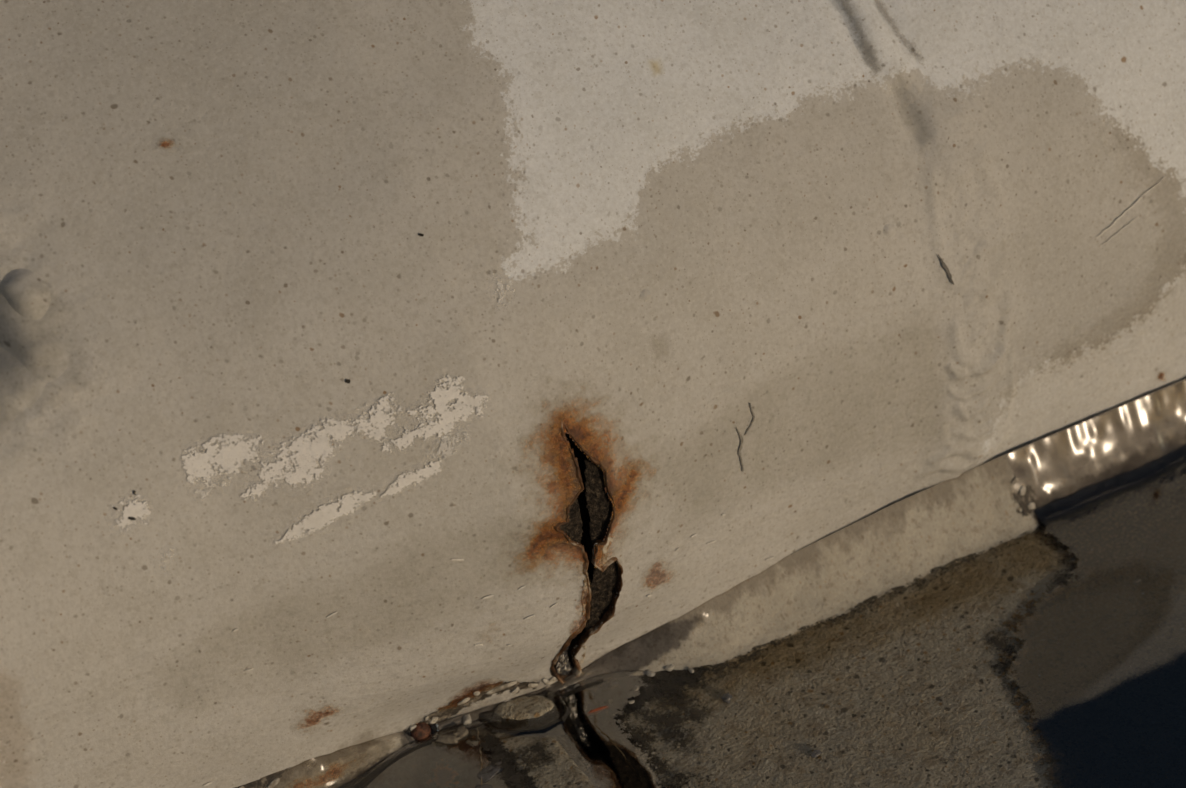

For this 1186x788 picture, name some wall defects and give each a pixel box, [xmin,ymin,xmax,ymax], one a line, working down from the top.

peeling [108,490,151,532]
peeling [181,375,488,544]
rust [524,407,647,568]
crack [550,420,623,684]
rust [300,707,340,728]